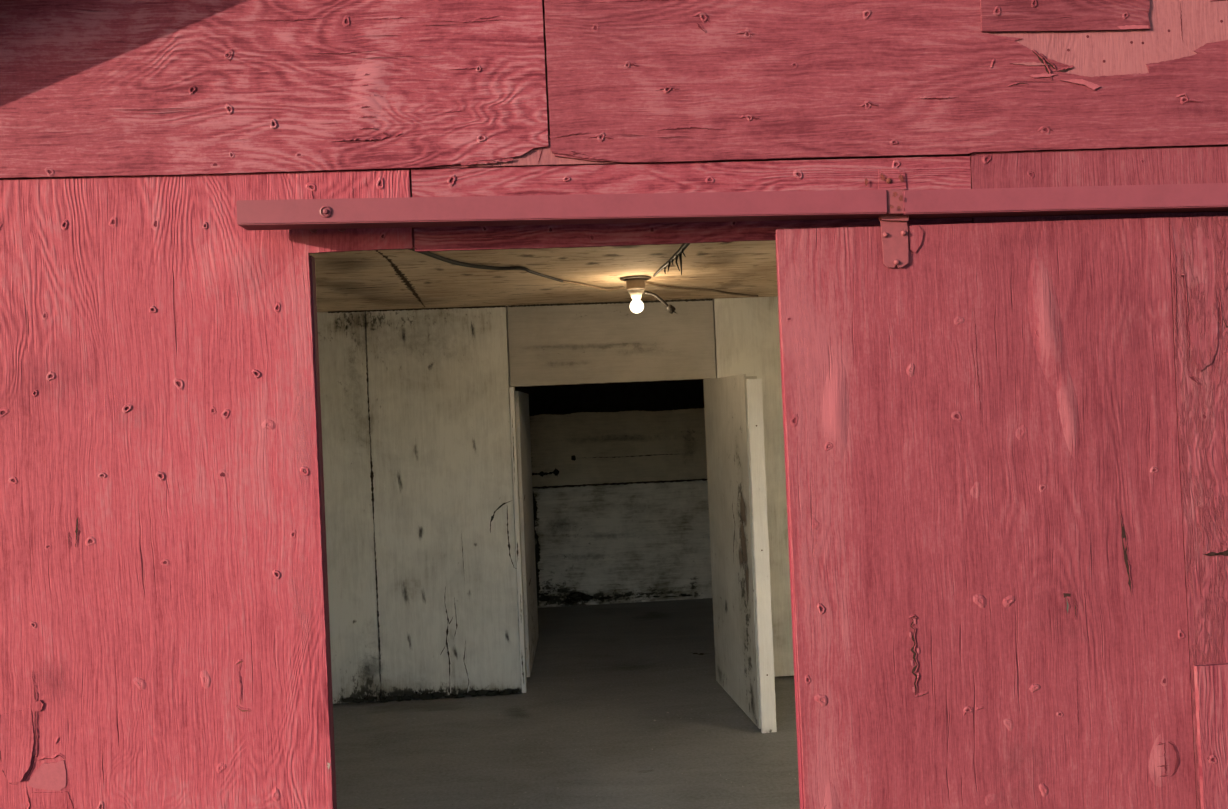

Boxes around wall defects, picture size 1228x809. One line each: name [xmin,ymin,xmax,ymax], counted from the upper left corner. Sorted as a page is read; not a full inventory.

peeling [989,0,1228,90]
crack [328,250,425,307]
leakage [538,592,612,605]
leakage [341,688,522,703]
crack [0,670,78,809]